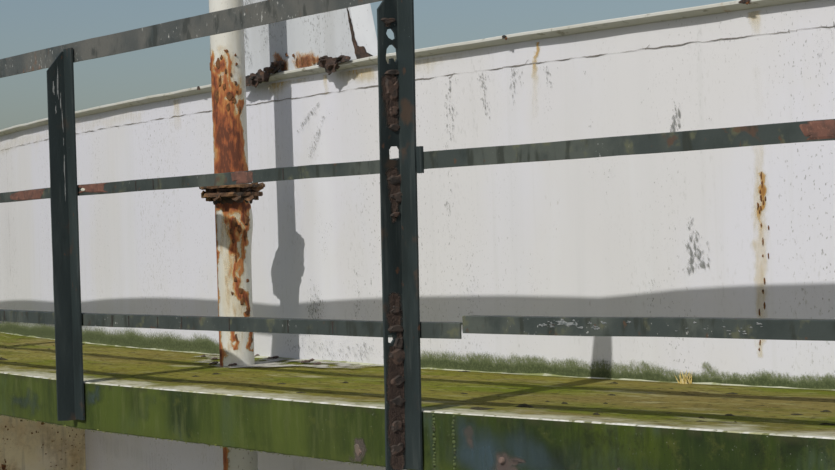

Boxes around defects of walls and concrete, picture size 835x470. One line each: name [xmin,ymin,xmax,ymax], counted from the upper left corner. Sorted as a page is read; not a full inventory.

crack [415,26,834,80]
crack [247,85,378,105]
rust [381,70,400,131]
peeling [799,120,835,140]
rust [210,49,351,317]
rust [757,172,769,230]
rust [219,331,254,367]
rust [386,293,405,470]